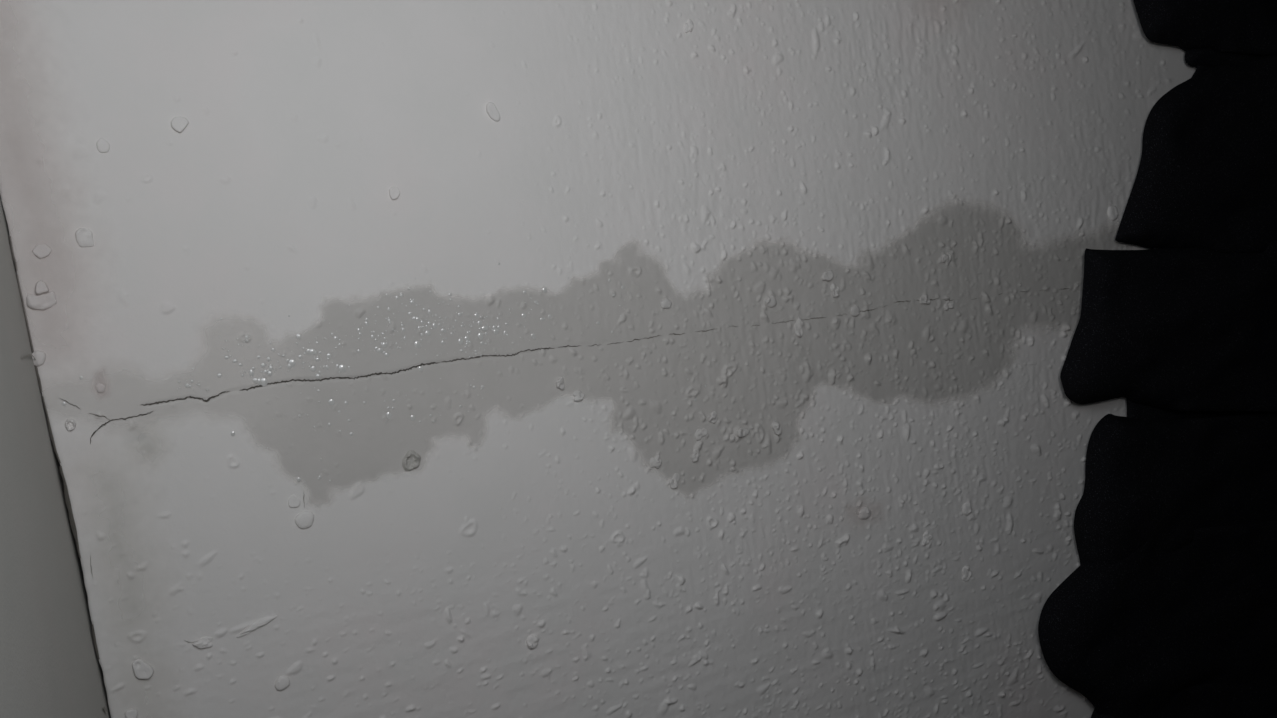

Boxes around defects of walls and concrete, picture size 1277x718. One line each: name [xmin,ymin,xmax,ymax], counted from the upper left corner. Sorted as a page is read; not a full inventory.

crack [9,236,1027,576]
water stain [220,203,1130,502]
crack [91,624,99,659]